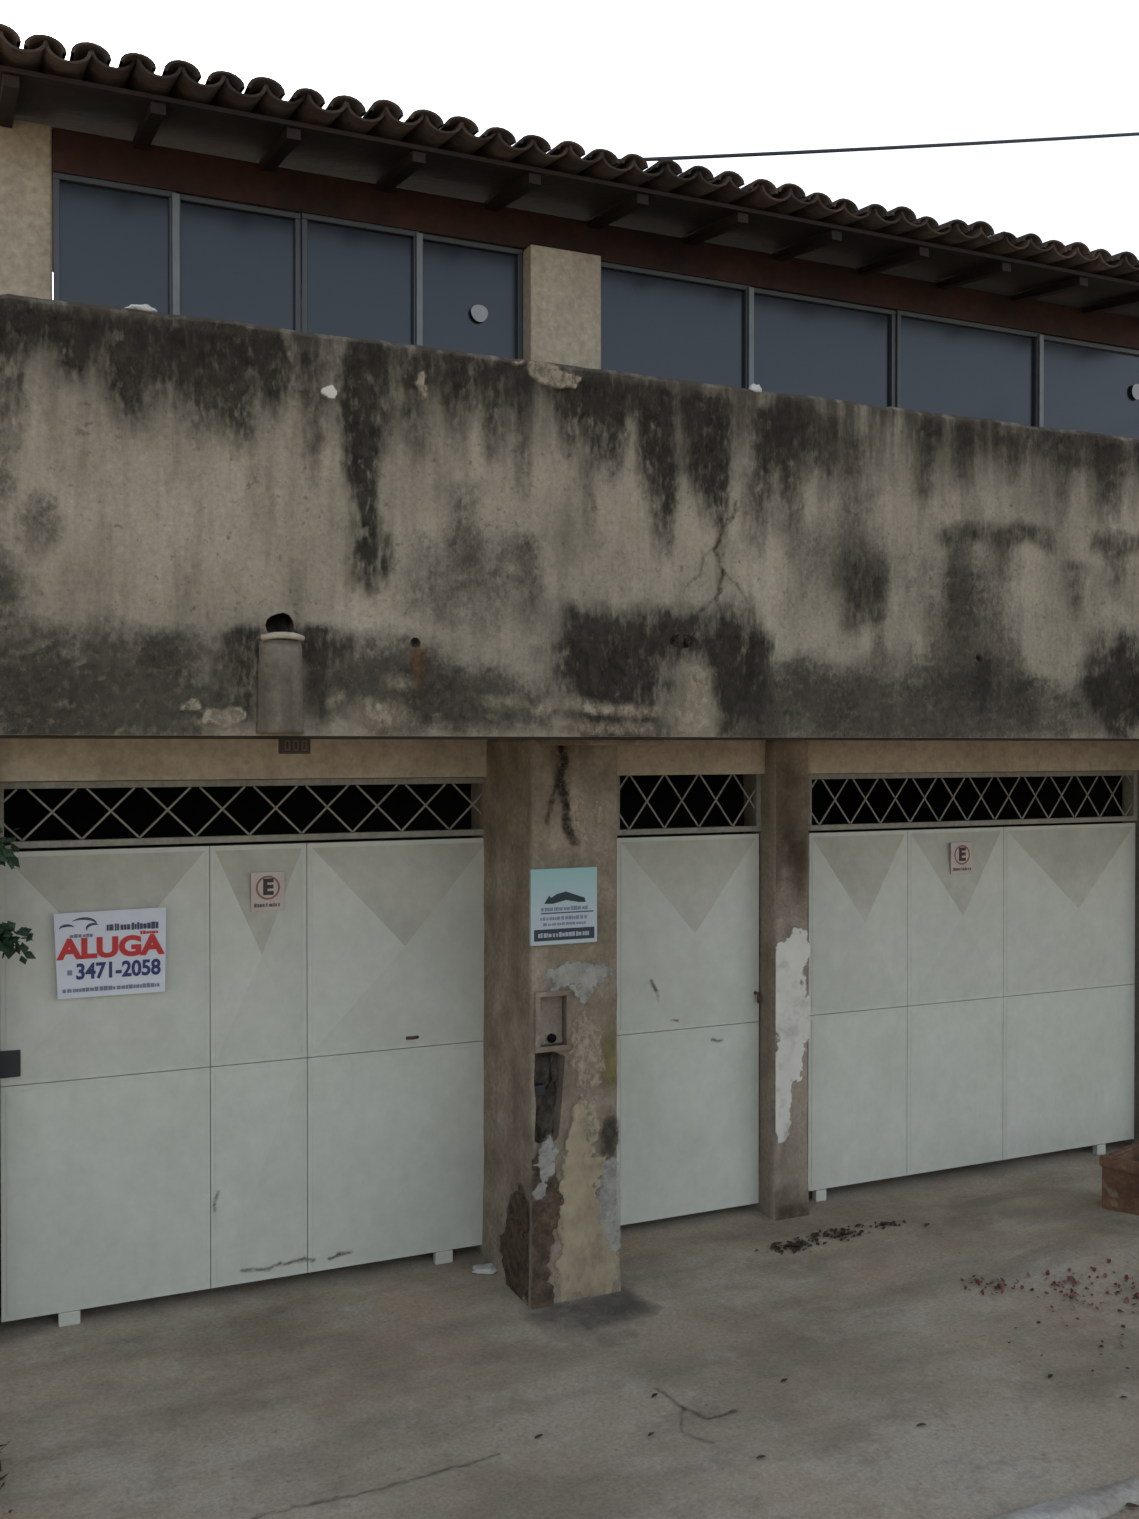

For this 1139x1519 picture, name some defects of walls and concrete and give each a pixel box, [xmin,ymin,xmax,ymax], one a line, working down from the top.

damp [0,301,291,436]
damp [341,341,523,585]
damp [555,370,730,528]
damp [752,401,859,525]
damp [0,566,549,736]
damp [414,498,541,609]
crack [713,500,737,630]
damp [557,524,1139,738]
crack [545,745,577,844]
peeling [775,927,810,1144]
peeling [500,961,621,1309]